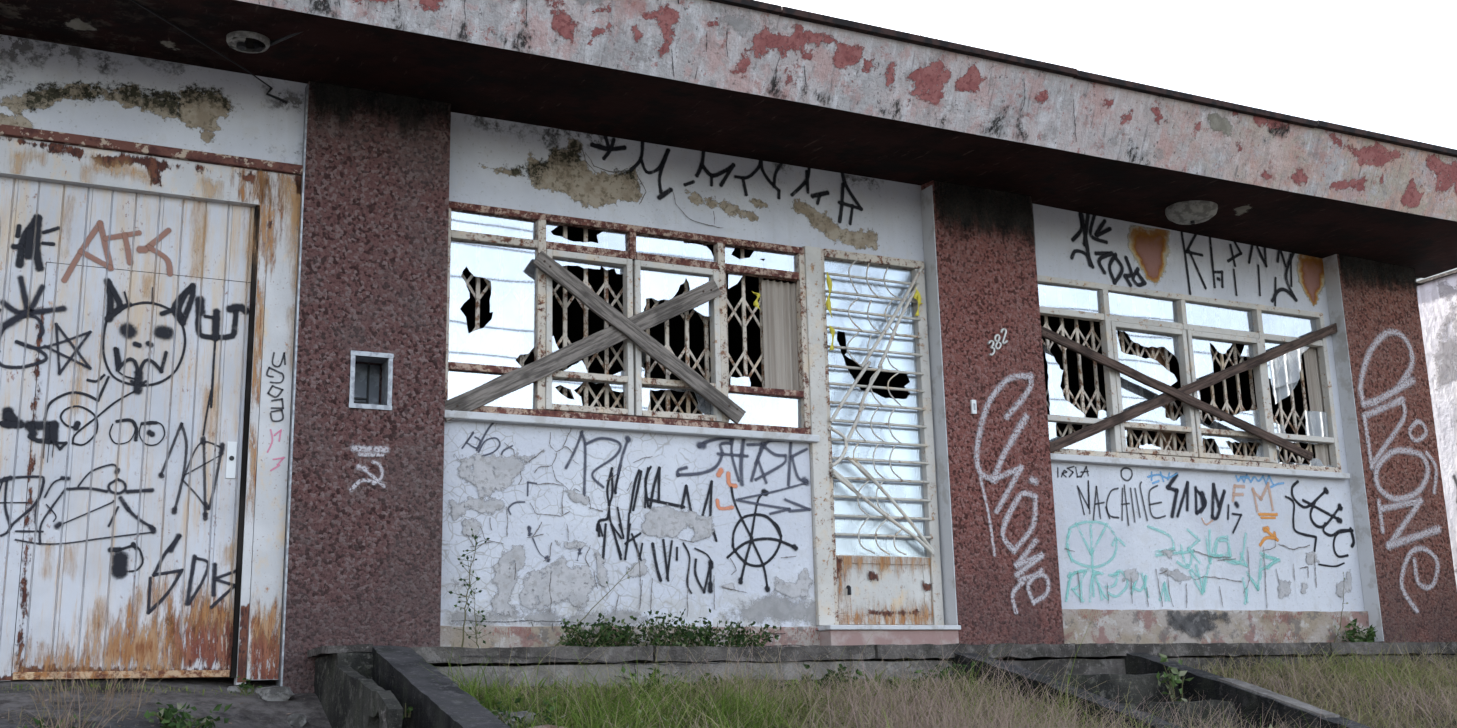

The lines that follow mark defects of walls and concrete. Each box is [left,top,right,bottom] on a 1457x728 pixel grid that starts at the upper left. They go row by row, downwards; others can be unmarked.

peeling [730,24,986,105]
flaking render [0,83,233,145]
rust [2,137,216,202]
flaking render [479,137,643,209]
flaking render [791,199,880,251]
rust [237,170,302,402]
rust [30,305,44,421]
rust [0,450,281,682]
peeling [484,540,609,638]
crack [461,430,731,680]
crack [680,539,747,616]
rust [836,555,934,625]